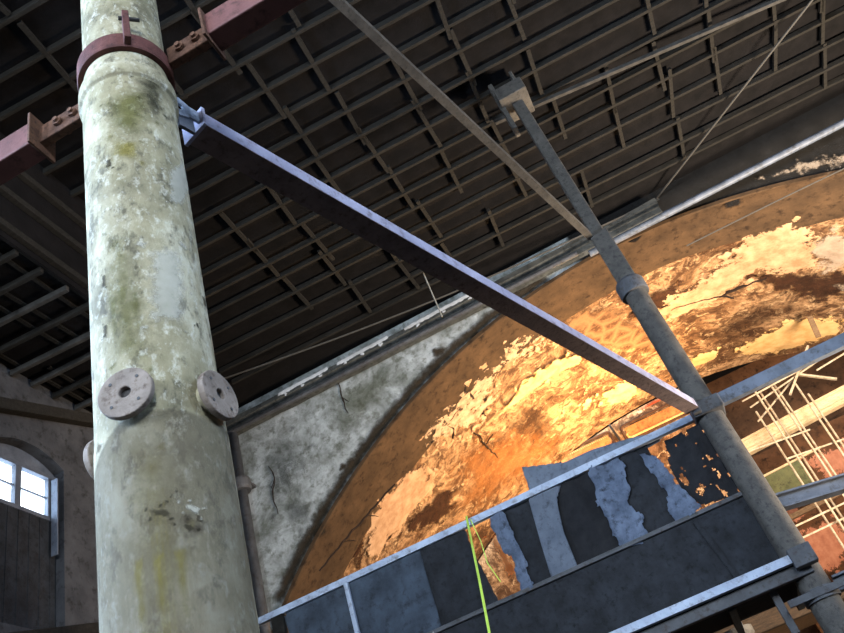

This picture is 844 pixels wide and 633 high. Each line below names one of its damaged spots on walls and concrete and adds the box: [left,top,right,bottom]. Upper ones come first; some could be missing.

peeling [651,216,844,355]
peeling [404,295,472,330]
peeling [568,307,656,352]
damp [723,306,793,339]
peeling [689,347,721,367]
flaking render [419,335,548,450]
peeling [504,352,581,412]
peeling [577,380,639,410]
flaking render [800,437,844,478]
peeling [351,466,457,569]
flaking render [787,508,844,573]